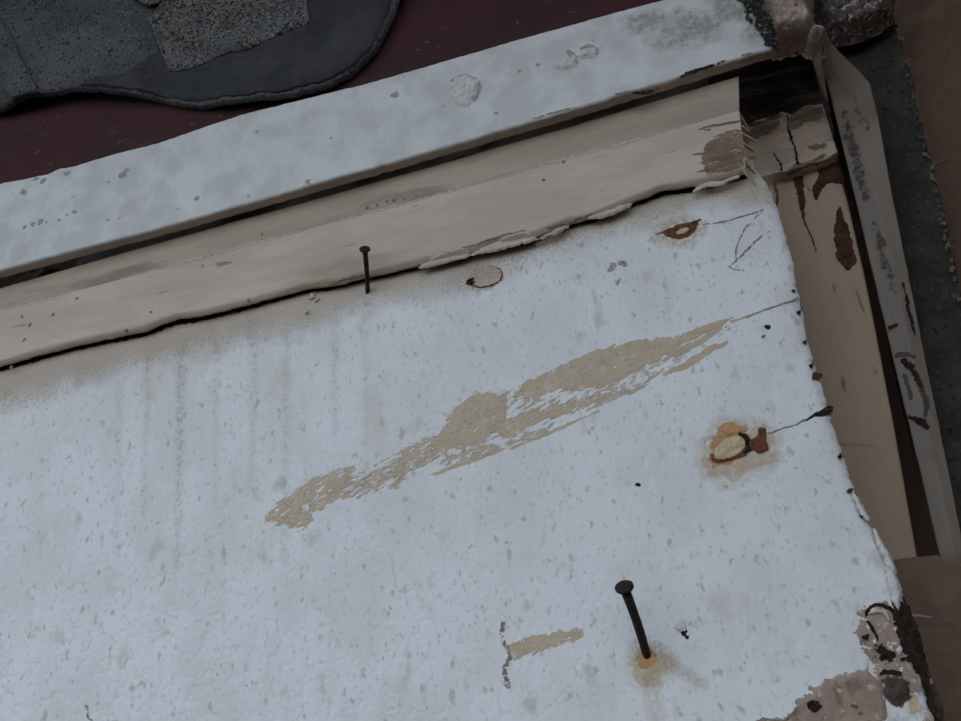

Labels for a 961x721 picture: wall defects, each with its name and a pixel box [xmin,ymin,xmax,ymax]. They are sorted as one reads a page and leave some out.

peeling [419,203,632,269]
corrosion [655,219,701,242]
peeling [693,175,740,193]
crack [703,209,763,271]
peeling [792,159,845,252]
peeling [833,207,857,270]
corrosion [462,263,503,289]
peeling [265,326,707,530]
corrosion [702,420,778,476]
spalling [756,488,933,721]
peeling [507,628,584,661]
corrosion [630,648,671,686]